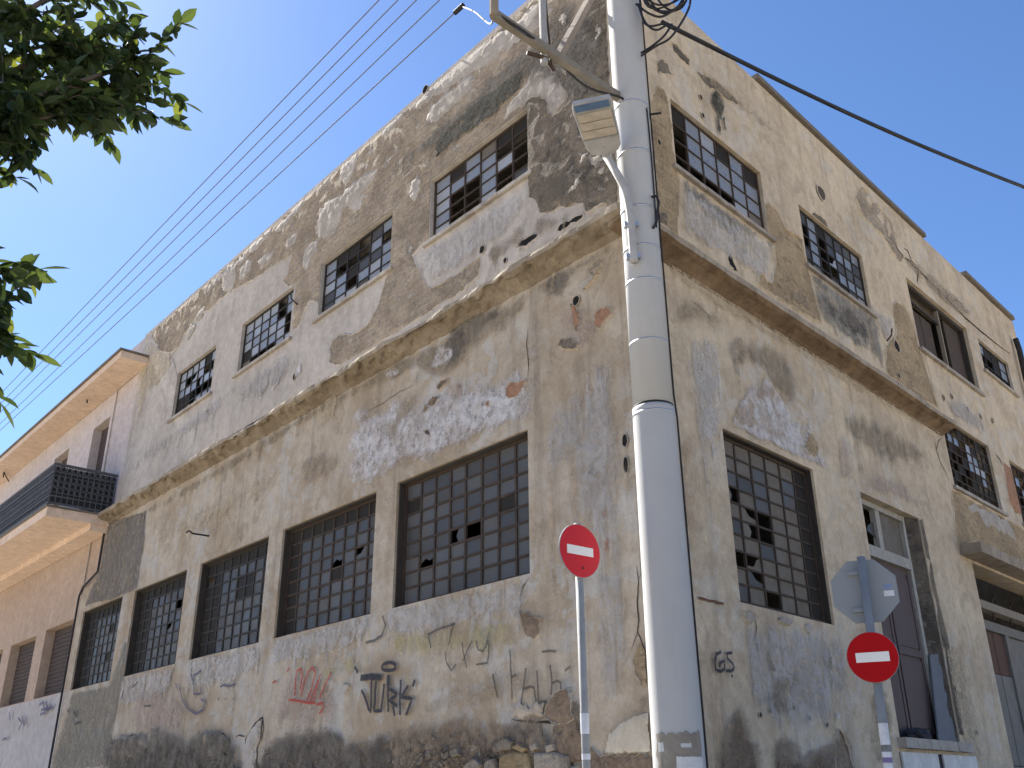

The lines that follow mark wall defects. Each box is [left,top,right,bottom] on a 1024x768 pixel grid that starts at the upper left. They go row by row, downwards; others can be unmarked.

spalling [151,0,584,366]
damp [672,265,863,399]
damp [814,276,893,366]
peeling [349,372,527,482]
peeling [734,379,825,466]
crack [631,562,646,651]
spalling [109,687,652,768]
damp [261,718,538,768]